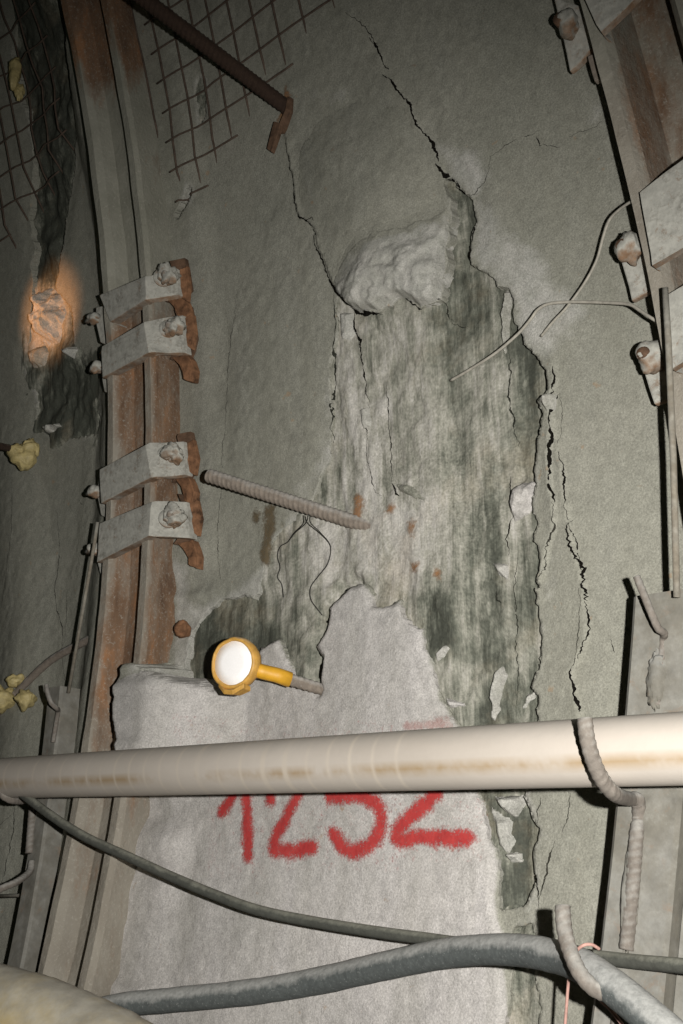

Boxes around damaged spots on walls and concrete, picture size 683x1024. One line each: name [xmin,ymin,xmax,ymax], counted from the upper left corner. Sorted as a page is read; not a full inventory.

crack [349,14,600,201]
spalling [14,0,100,450]
crack [406,298,468,328]
spalling [190,182,557,727]
crack [507,346,520,446]
crack [495,366,615,712]
spalling [481,789,540,910]
crack [535,798,570,906]
spalling [509,967,542,1024]